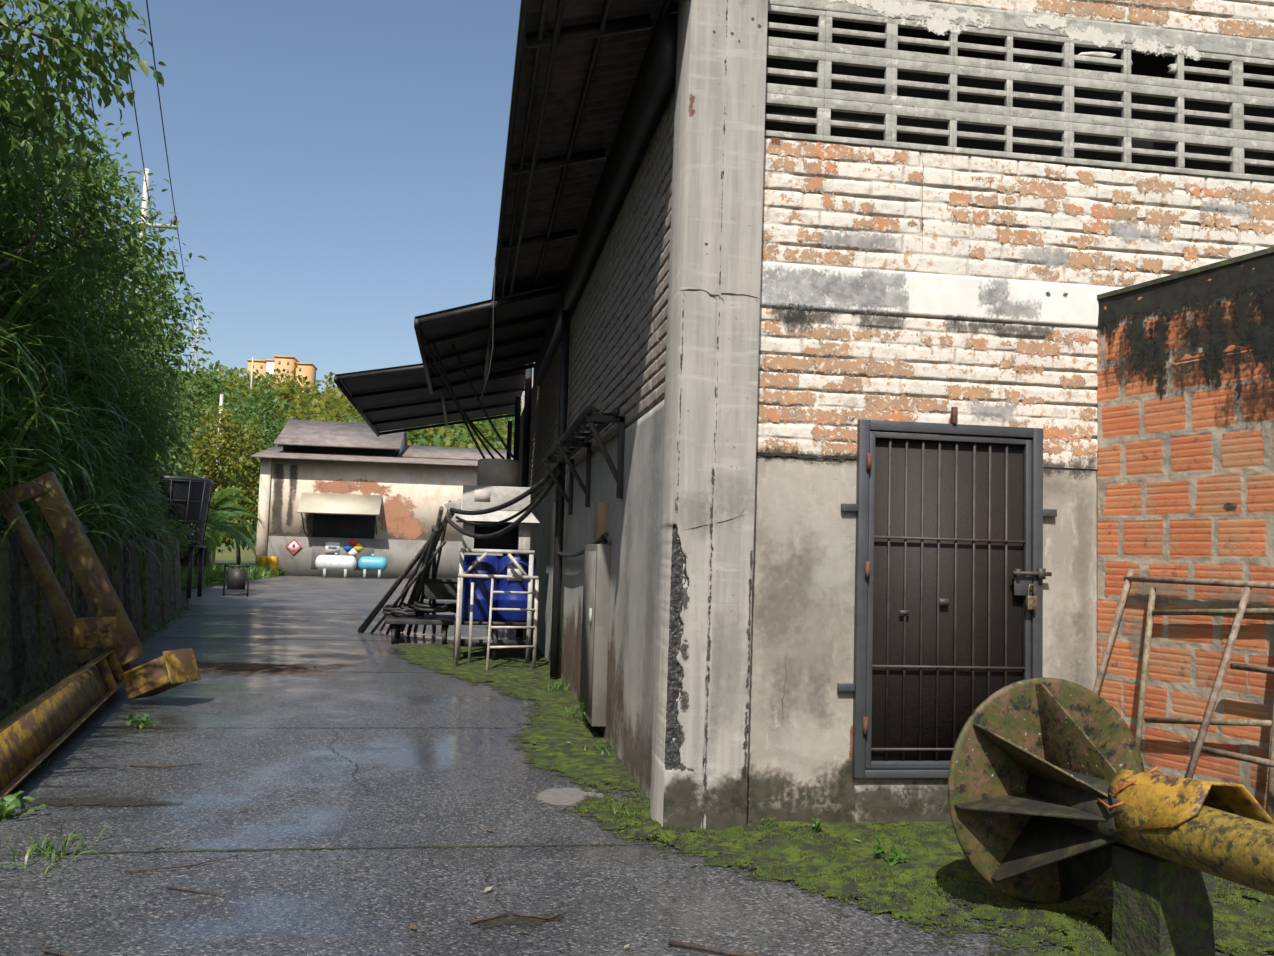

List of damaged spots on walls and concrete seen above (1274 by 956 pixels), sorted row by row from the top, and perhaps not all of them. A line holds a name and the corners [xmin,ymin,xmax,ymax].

peeling [828,0,993,36]
peeling [1023,0,1203,61]
peeling [765,140,925,233]
peeling [947,168,1274,297]
water stain [1110,221,1161,242]
peeling [757,318,1097,459]
water stain [1096,253,1274,423]
spalling [664,266,721,790]
water stain [196,661,343,675]
water stain [559,602,582,704]
water stain [598,642,652,788]
water stain [662,760,952,840]